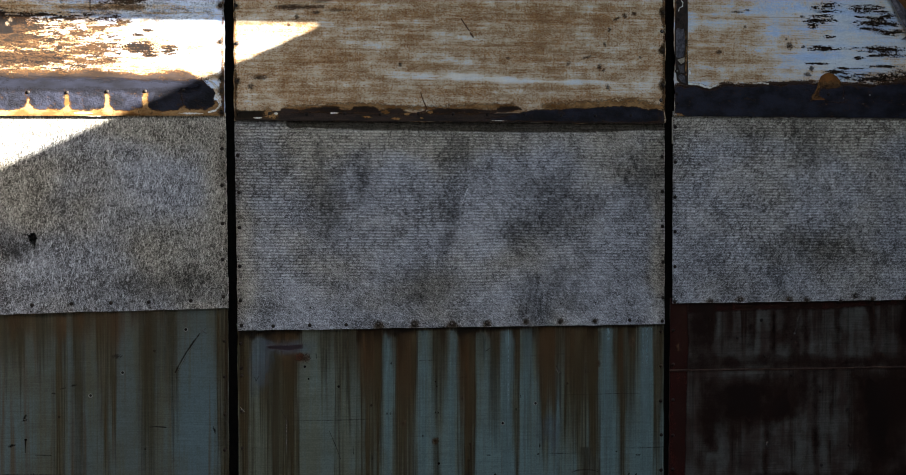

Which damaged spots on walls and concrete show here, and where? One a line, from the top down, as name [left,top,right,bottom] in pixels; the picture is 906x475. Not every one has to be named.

peeling [0,0,221,116]
rust [216,0,267,116]
rust [275,0,343,26]
peeling [274,1,906,123]
rust [3,314,24,391]
rust [38,312,83,475]
rust [95,310,177,475]
rust [213,308,311,475]
rust [321,318,664,475]